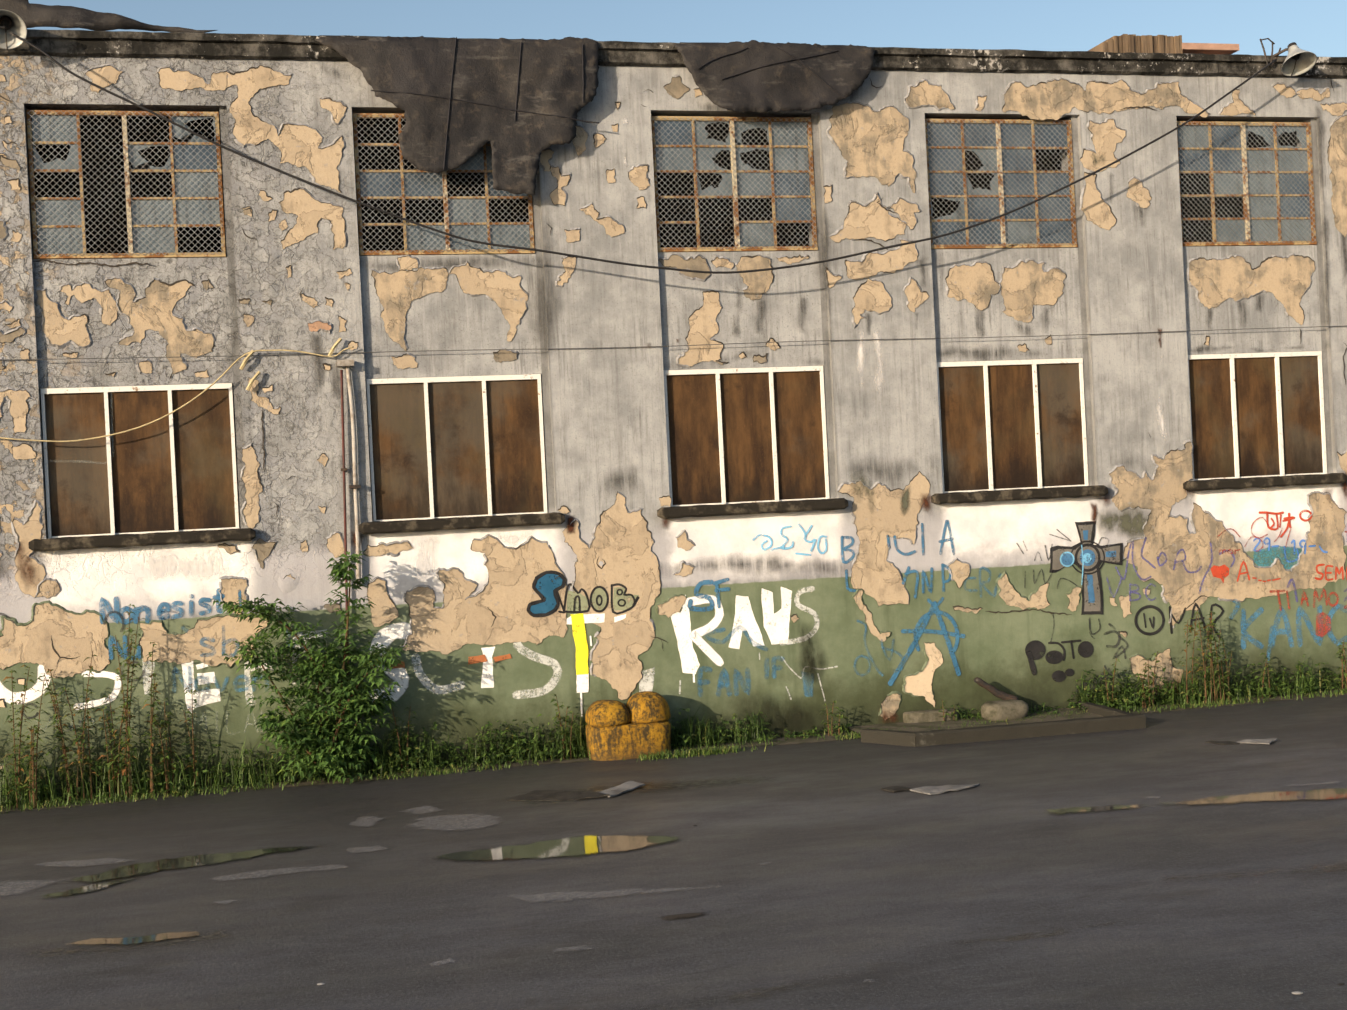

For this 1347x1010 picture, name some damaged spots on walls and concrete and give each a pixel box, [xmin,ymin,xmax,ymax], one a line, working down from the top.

spalling [0,276,216,379]
peeling [156,65,348,250]
spalling [371,255,529,369]
peeling [658,252,810,368]
spalling [823,78,956,329]
spalling [945,258,1067,323]
spalling [1002,77,1256,230]
spalling [1186,253,1315,325]
peeling [0,499,110,685]
peeling [363,491,696,701]
peeling [837,471,930,642]
spalling [1108,439,1347,638]